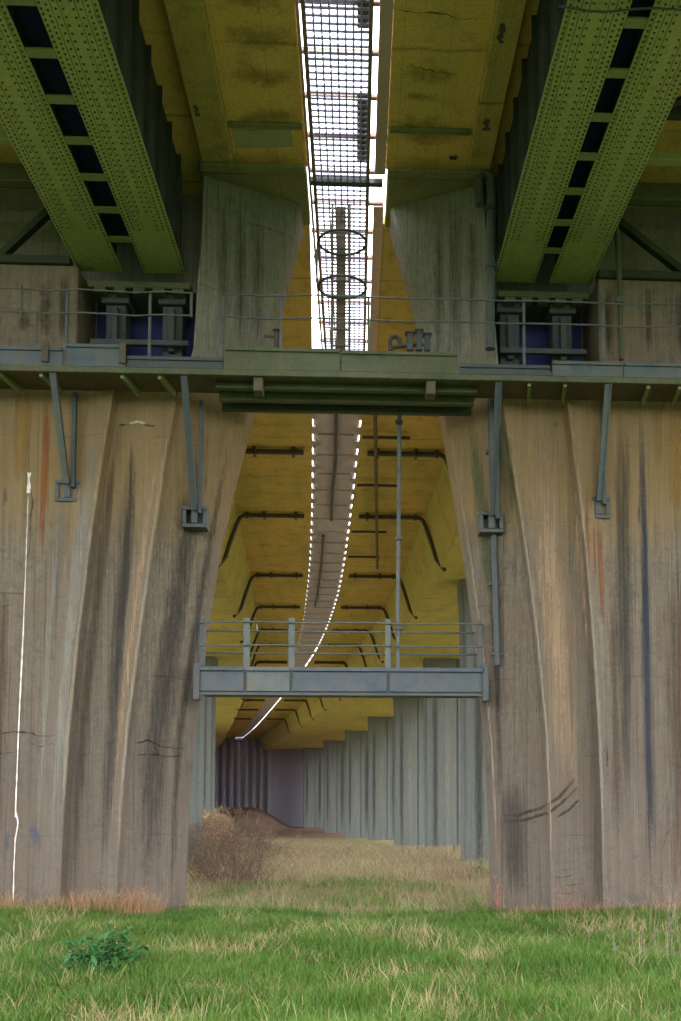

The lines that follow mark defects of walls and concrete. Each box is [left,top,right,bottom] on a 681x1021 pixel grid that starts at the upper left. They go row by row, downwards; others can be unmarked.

crack [0,470,55,901]
leakage [104,446,166,822]
crack [110,740,177,759]
leakage [145,525,212,845]
leakage [509,783,578,878]
leakage [499,426,603,805]
leakage [612,461,652,820]